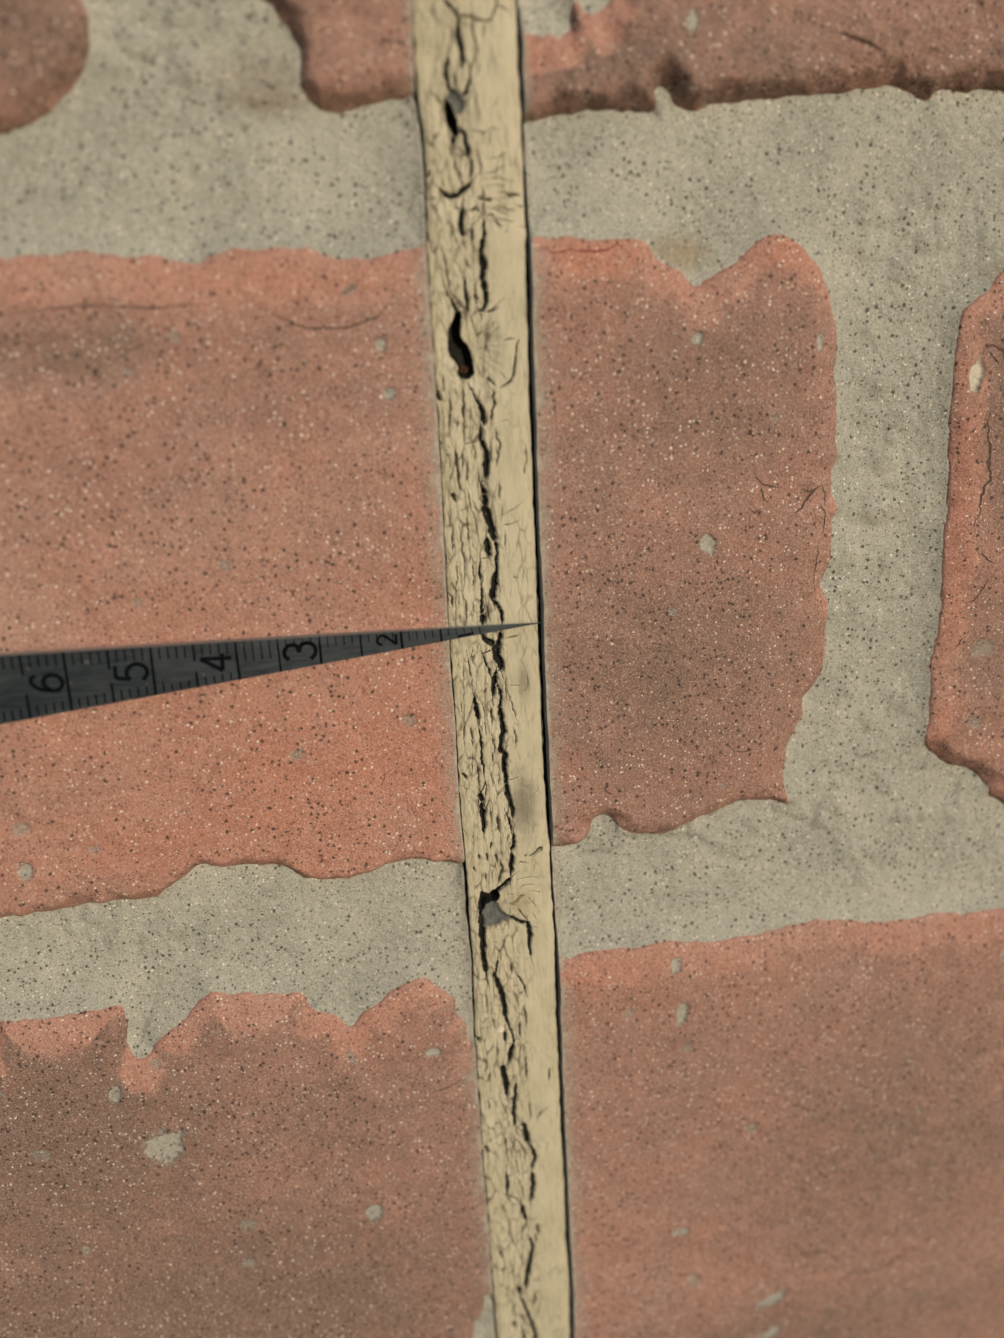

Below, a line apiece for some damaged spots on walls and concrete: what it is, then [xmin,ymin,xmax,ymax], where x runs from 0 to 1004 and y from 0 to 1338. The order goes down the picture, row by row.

crack [257,0,629,1338]